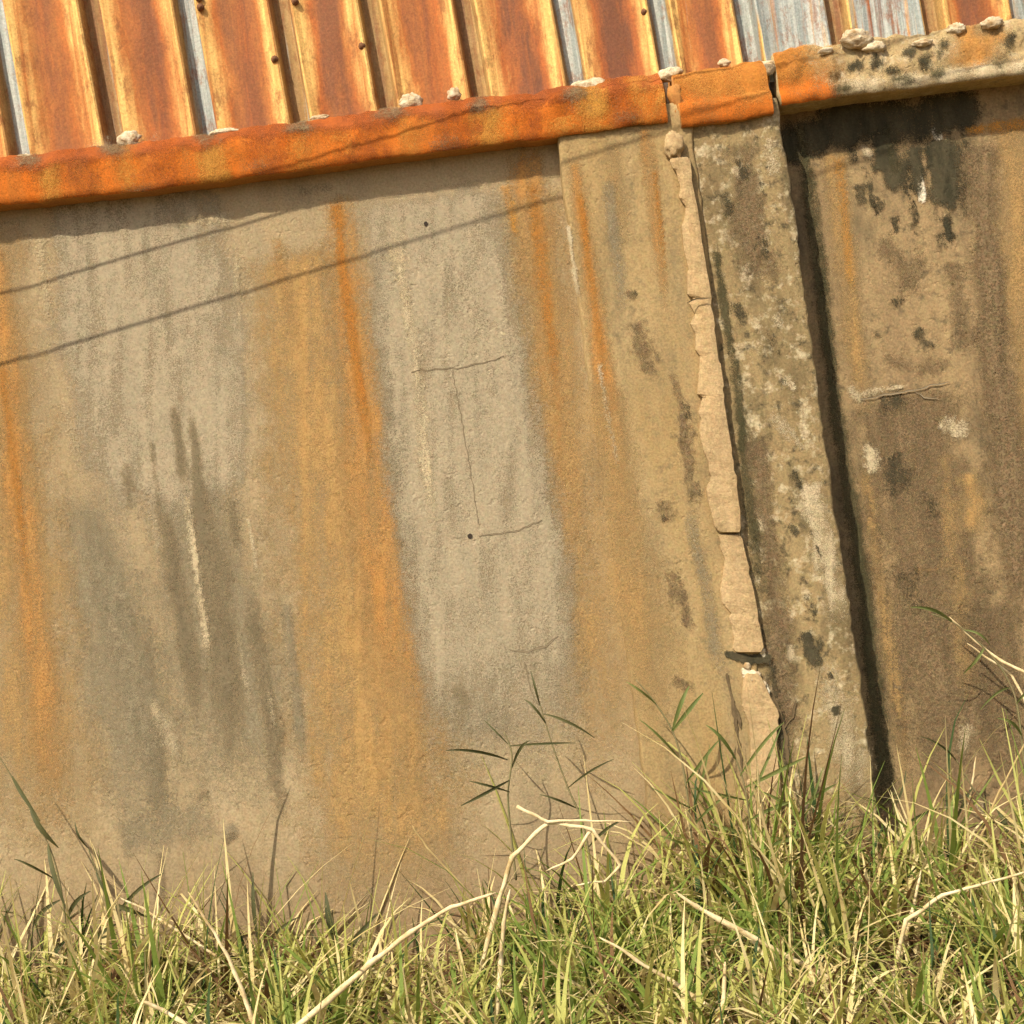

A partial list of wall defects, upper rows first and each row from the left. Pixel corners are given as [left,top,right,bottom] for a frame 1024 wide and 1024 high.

rust [0,221,102,838]
water stain [57,409,304,902]
rust [243,196,483,902]
rust [0,44,841,289]
crack [411,356,542,537]
crack [509,636,558,704]
rust [569,160,681,732]
water stain [669,374,701,501]
spalling [724,651,771,677]
water stain [713,144,818,774]
water stain [780,91,1024,807]
crack [860,382,948,400]